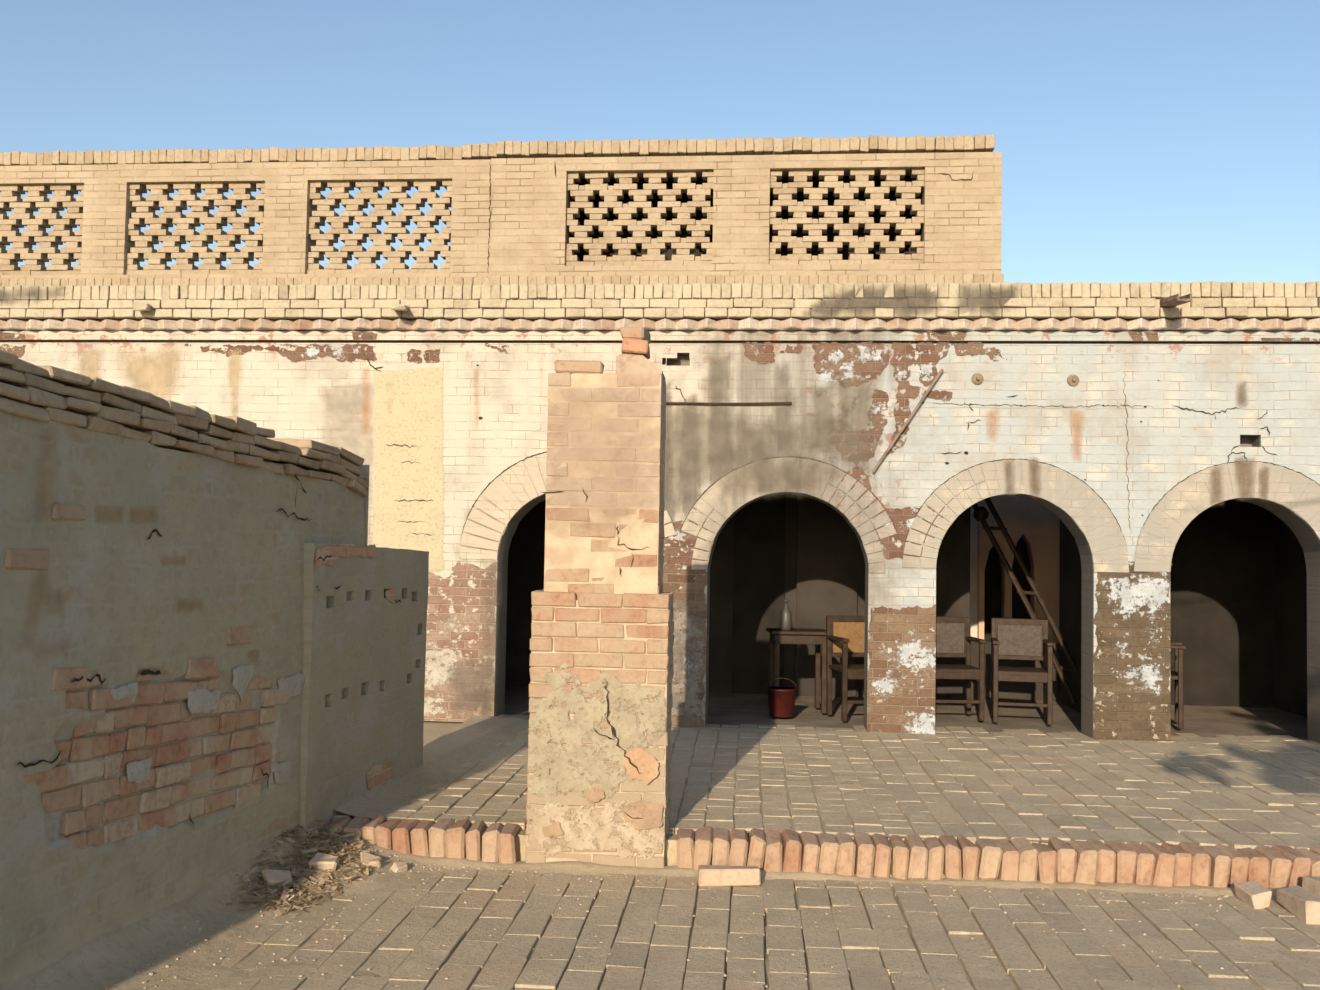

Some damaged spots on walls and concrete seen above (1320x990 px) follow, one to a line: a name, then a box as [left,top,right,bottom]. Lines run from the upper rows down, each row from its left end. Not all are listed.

peeling [185,331,377,363]
crack [273,475,312,521]
peeling [743,332,1007,559]
crack [17,751,61,768]
spalling [24,657,305,850]
peeling [424,560,497,722]
spalling [526,520,708,861]
peeling [867,604,936,734]
peeling [1093,561,1172,742]